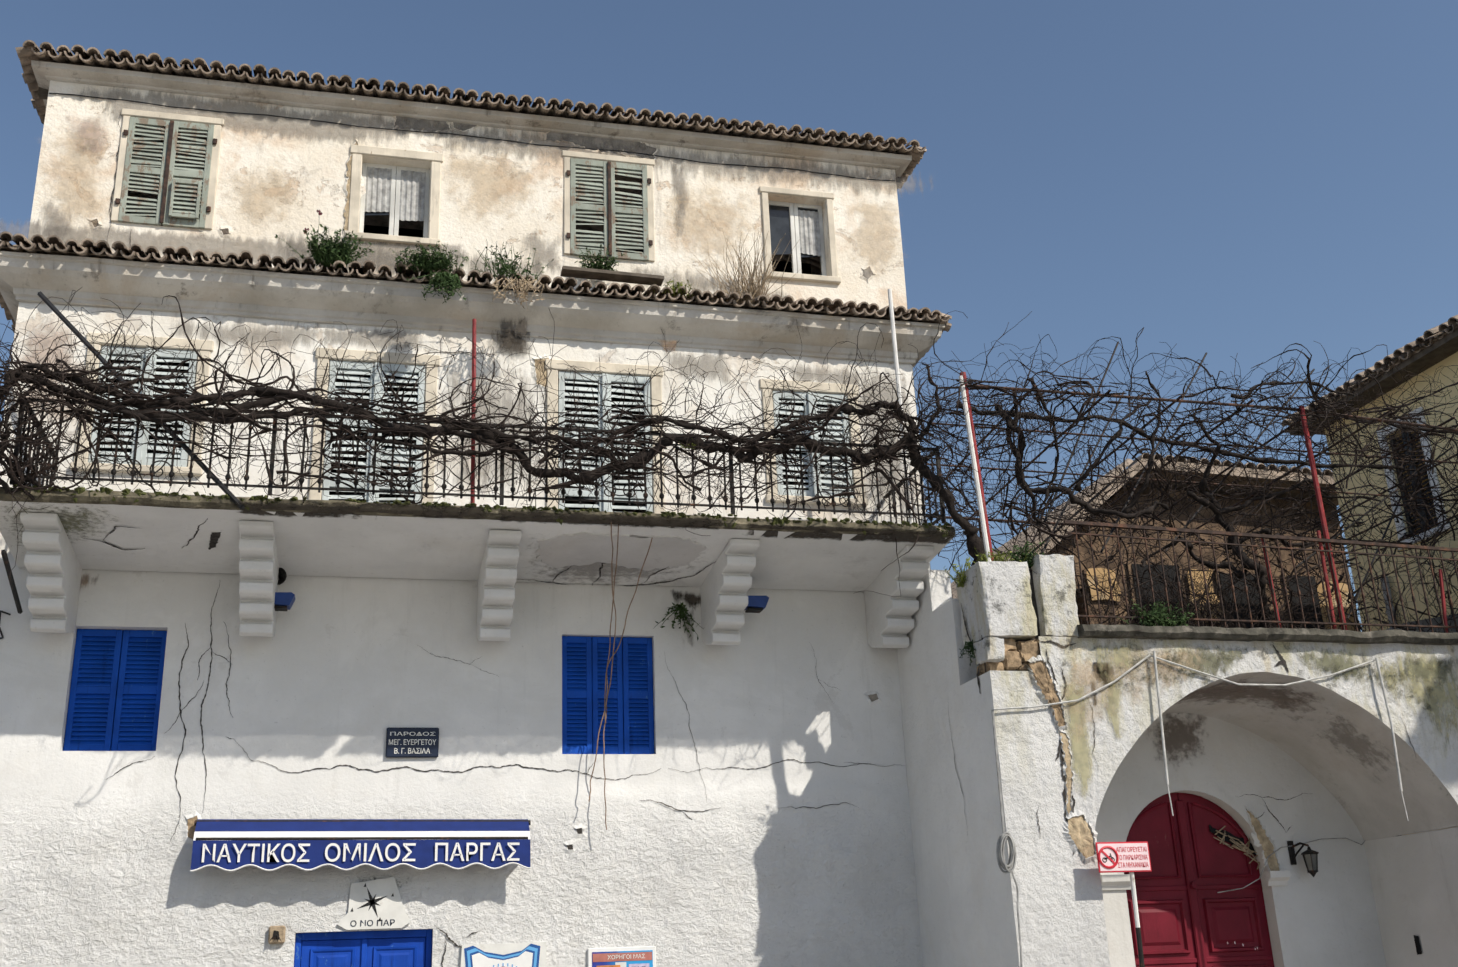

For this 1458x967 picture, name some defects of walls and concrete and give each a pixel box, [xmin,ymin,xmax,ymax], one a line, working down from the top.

damp [497,318,531,354]
spalling [535,532,707,571]
crack [107,584,902,841]
spalling [977,569,1098,865]